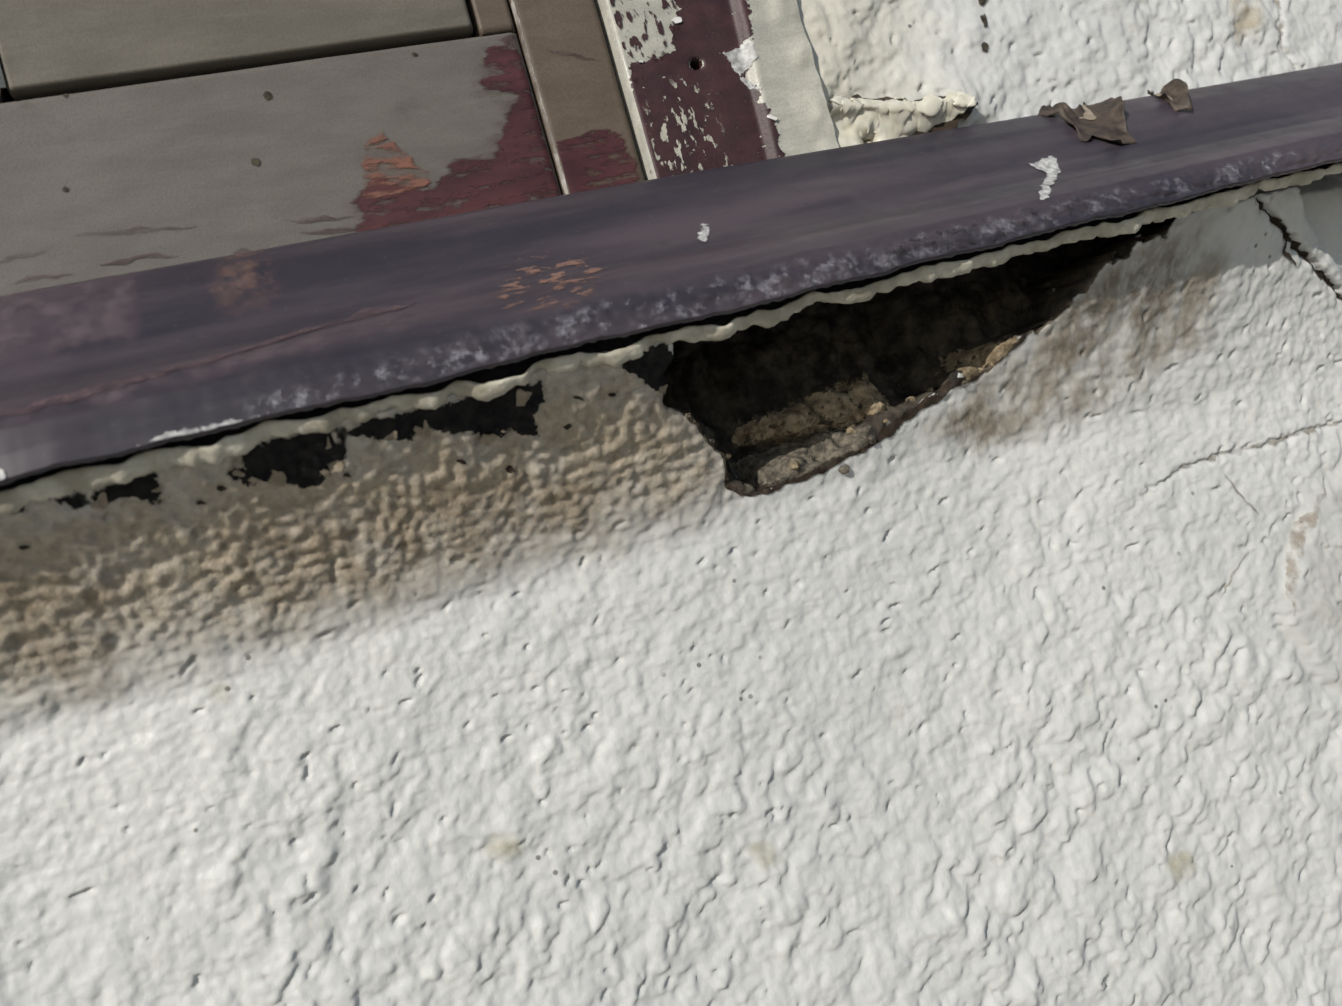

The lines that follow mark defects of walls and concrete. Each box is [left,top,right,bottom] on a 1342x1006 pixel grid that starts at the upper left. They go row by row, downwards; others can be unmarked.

peeling [352,0,785,232]
peeling [828,91,978,147]
peeling [855,156,1111,272]
crack [1256,199,1342,300]
spalling [622,217,1176,497]
peeling [48,473,162,510]
peeling [150,419,242,441]
leakage [0,373,710,674]
peeling [216,380,545,491]
crack [1181,457,1257,512]
crack [1268,422,1337,445]